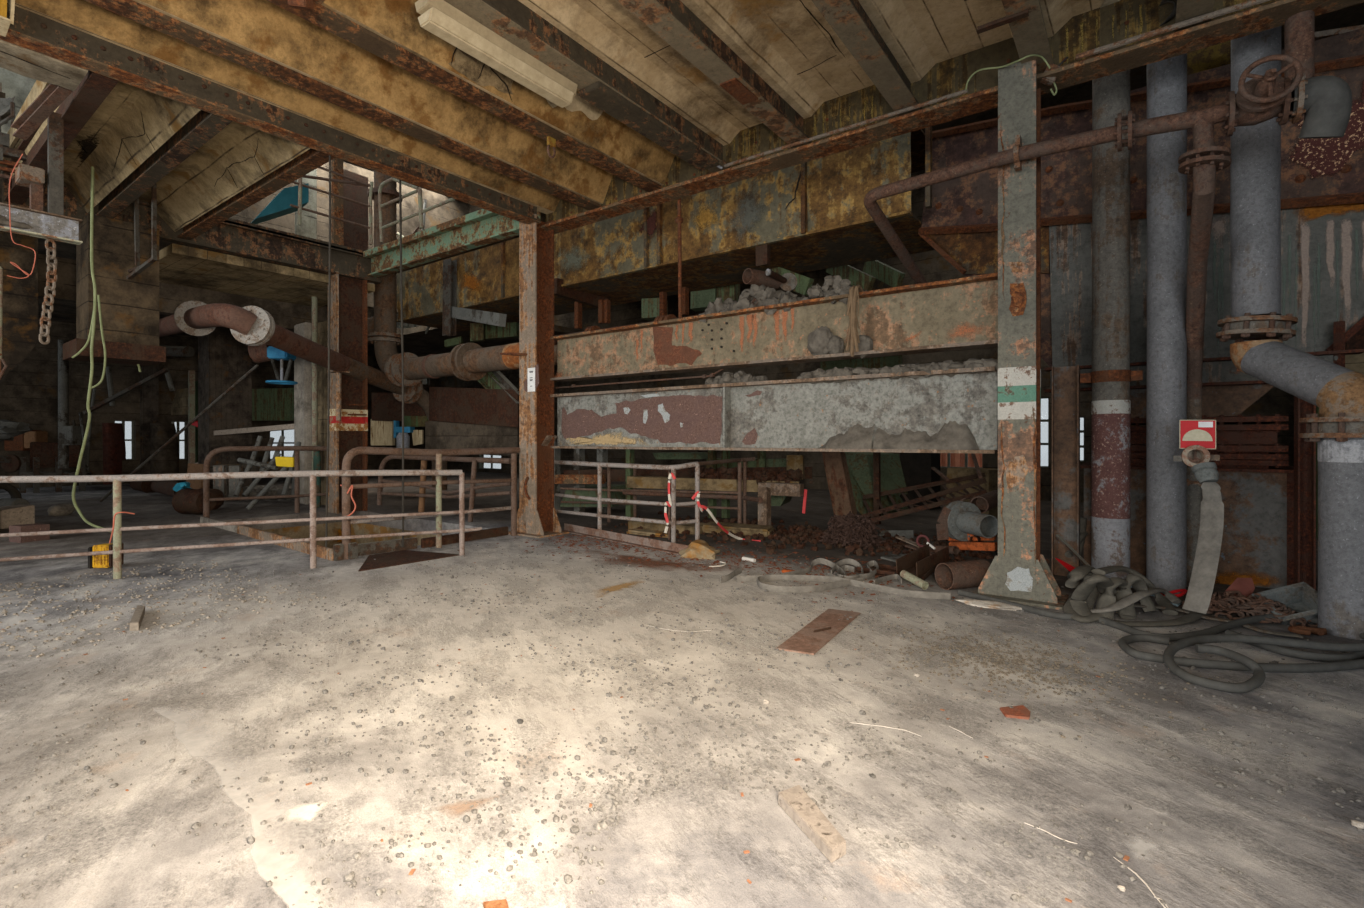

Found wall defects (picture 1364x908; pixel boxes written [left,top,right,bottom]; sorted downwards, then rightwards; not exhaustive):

peeling [1290,80,1364,179]
rust [1000,132,1027,316]
leakage [1283,220,1364,345]
peeling [561,393,723,444]
peeling [742,428,758,445]